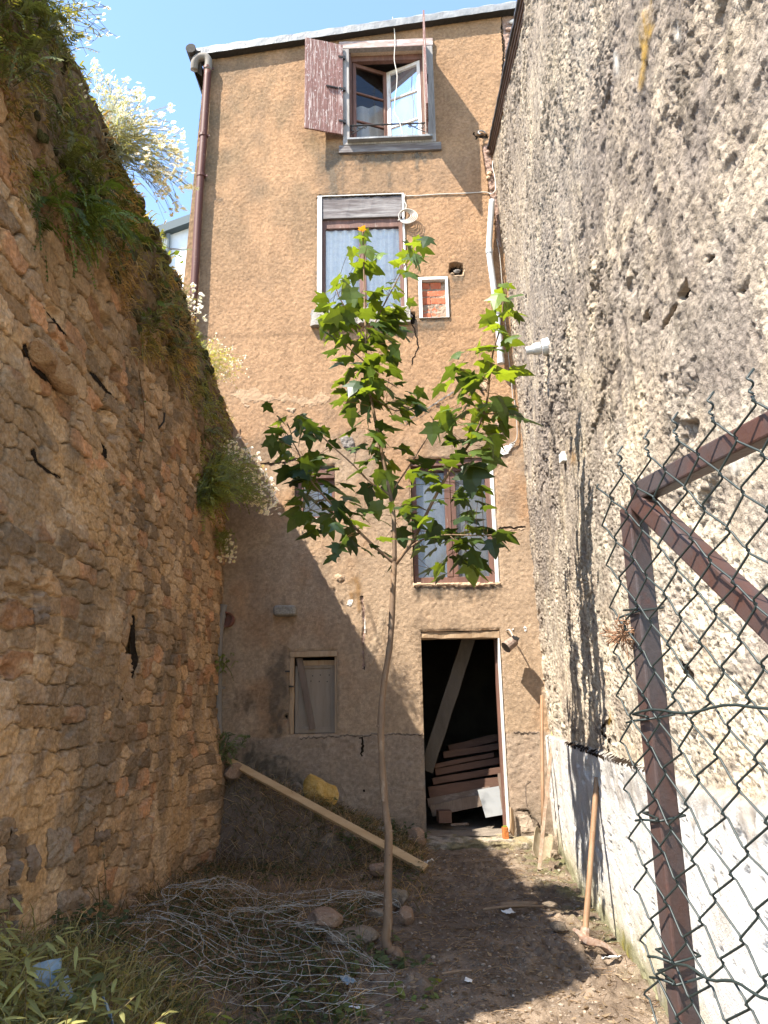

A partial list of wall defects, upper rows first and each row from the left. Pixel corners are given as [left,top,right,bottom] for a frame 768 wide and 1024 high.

crack [300,733,423,756]
crack [564,717,645,774]